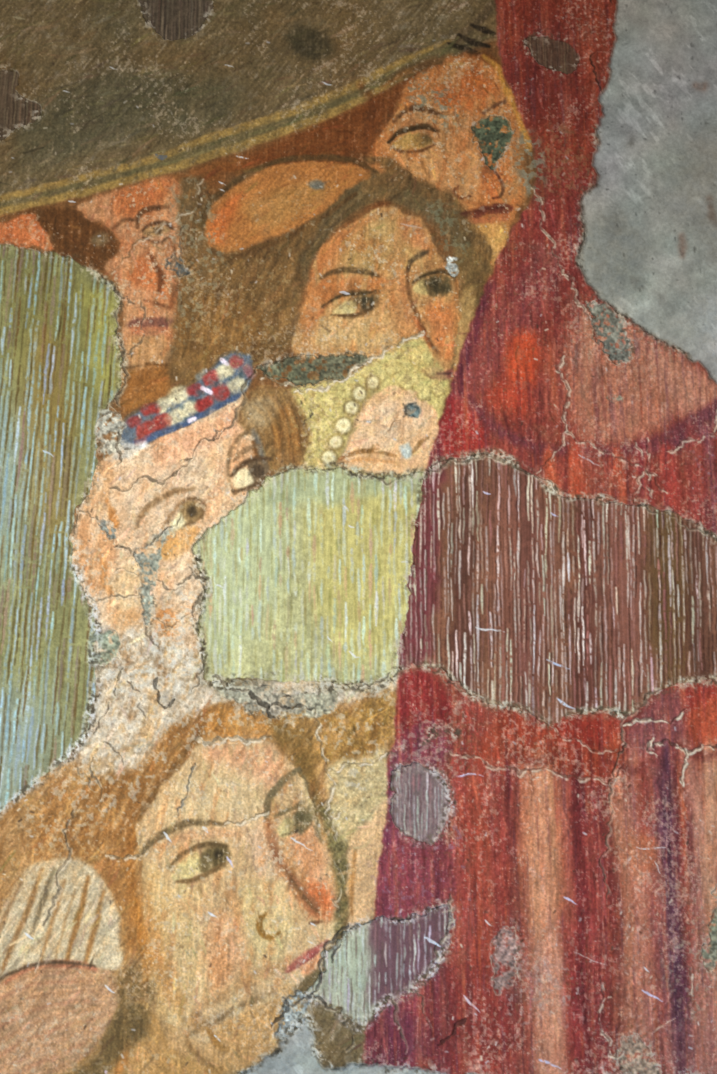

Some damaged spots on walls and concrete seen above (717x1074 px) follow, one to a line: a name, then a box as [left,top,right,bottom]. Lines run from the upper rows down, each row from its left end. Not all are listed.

spalling [471,114,515,170]
crack [123,179,203,277]
spalling [576,0,717,383]
crack [100,287,424,492]
crack [431,355,717,513]
crack [89,515,182,603]
crack [146,567,211,647]
spalling [213,678,339,720]
crack [448,691,717,900]
spalling [700,885,717,973]
spalling [240,998,440,1074]
spalling [614,1034,662,1074]